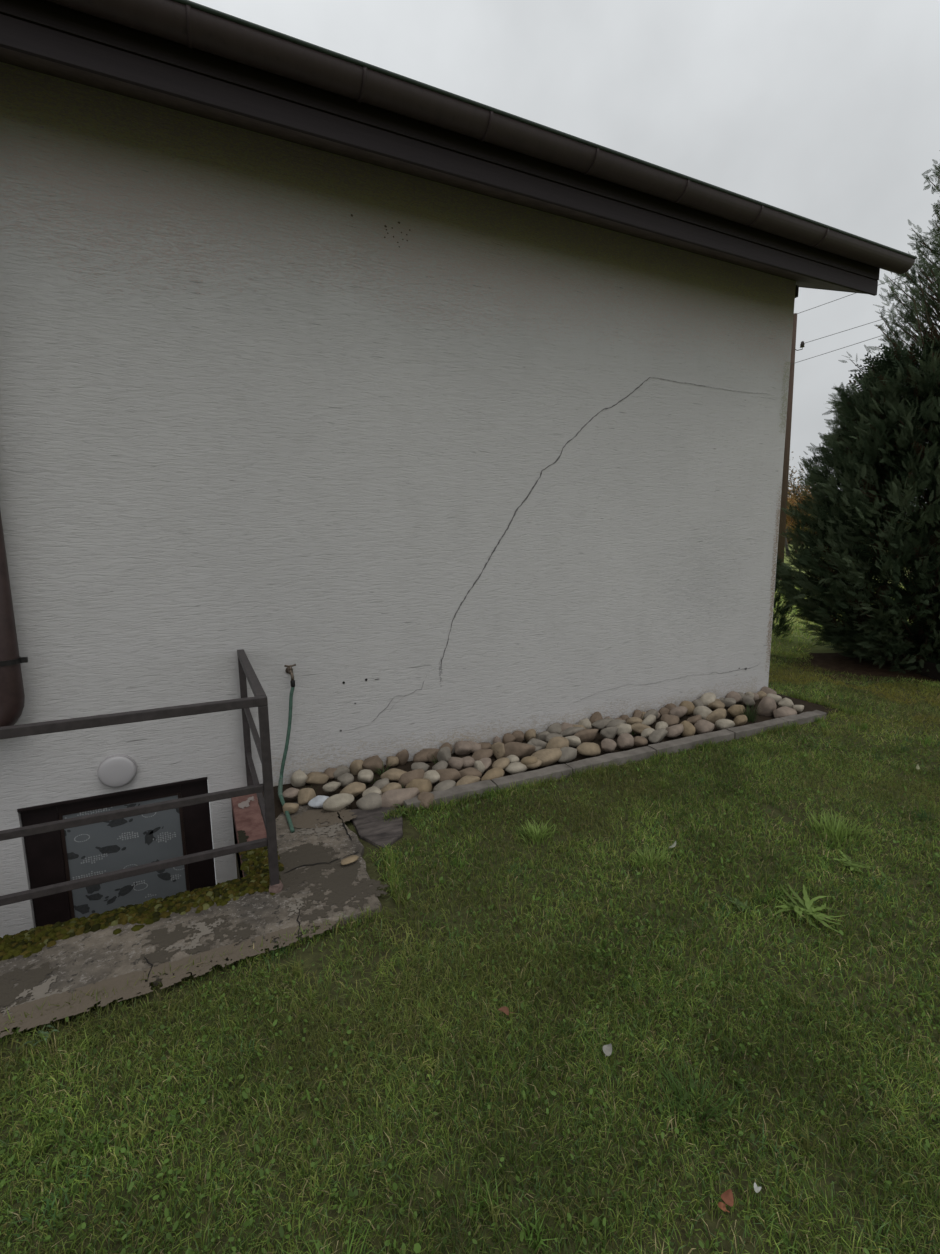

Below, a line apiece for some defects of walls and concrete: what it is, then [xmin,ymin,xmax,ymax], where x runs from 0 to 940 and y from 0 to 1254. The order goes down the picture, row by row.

crack [342,377,776,731]